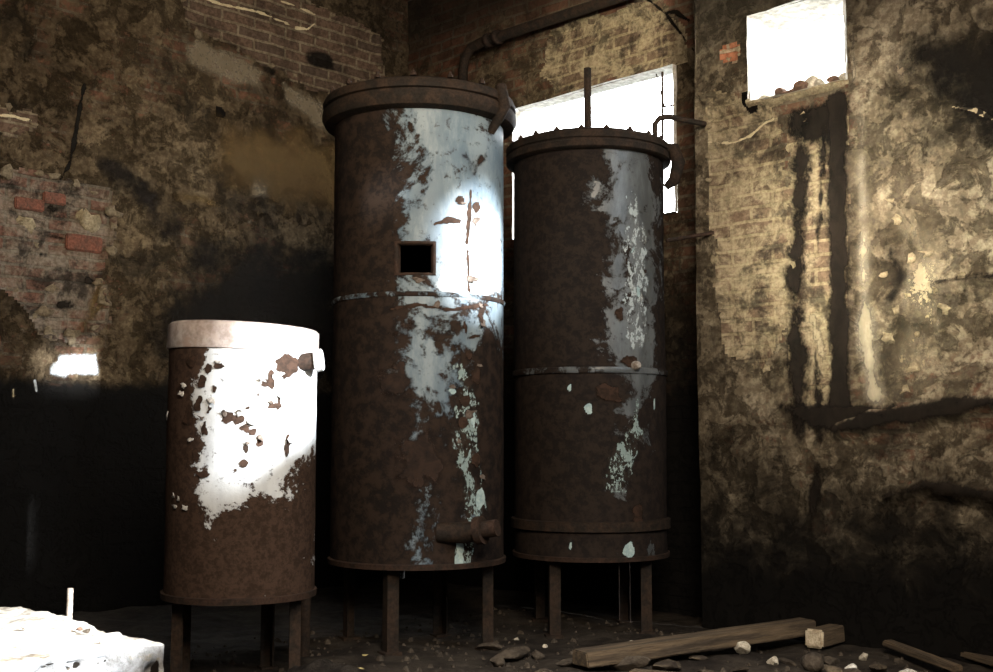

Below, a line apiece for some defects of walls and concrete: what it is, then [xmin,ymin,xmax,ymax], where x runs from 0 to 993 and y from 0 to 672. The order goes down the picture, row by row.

flaking render [181,0,385,94]
spalling [0,164,124,347]
spalling [703,79,849,406]
water stain [777,90,896,442]
water stain [808,462,822,529]